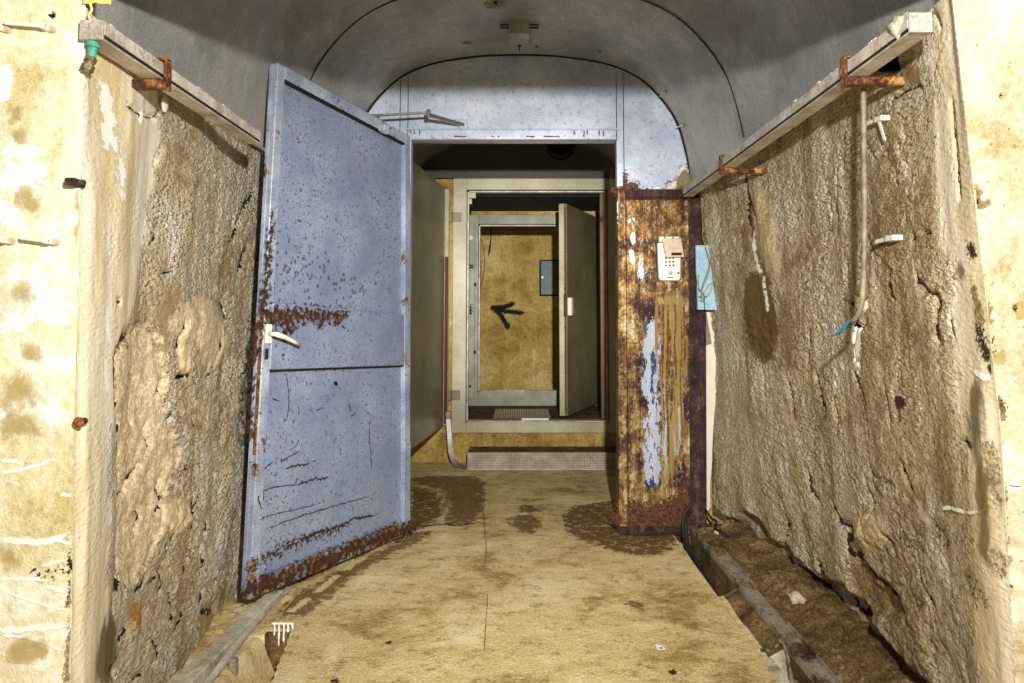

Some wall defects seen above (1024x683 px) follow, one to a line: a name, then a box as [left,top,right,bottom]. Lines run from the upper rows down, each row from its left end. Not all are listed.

rust [242,211,366,442]
peeling [617,201,644,282]
water stain [743,192,779,363]
crack [917,276,954,340]
rust [562,290,696,555]
peeling [641,317,684,488]
rust [239,519,419,603]
water stain [280,476,486,617]
crack [809,473,905,617]